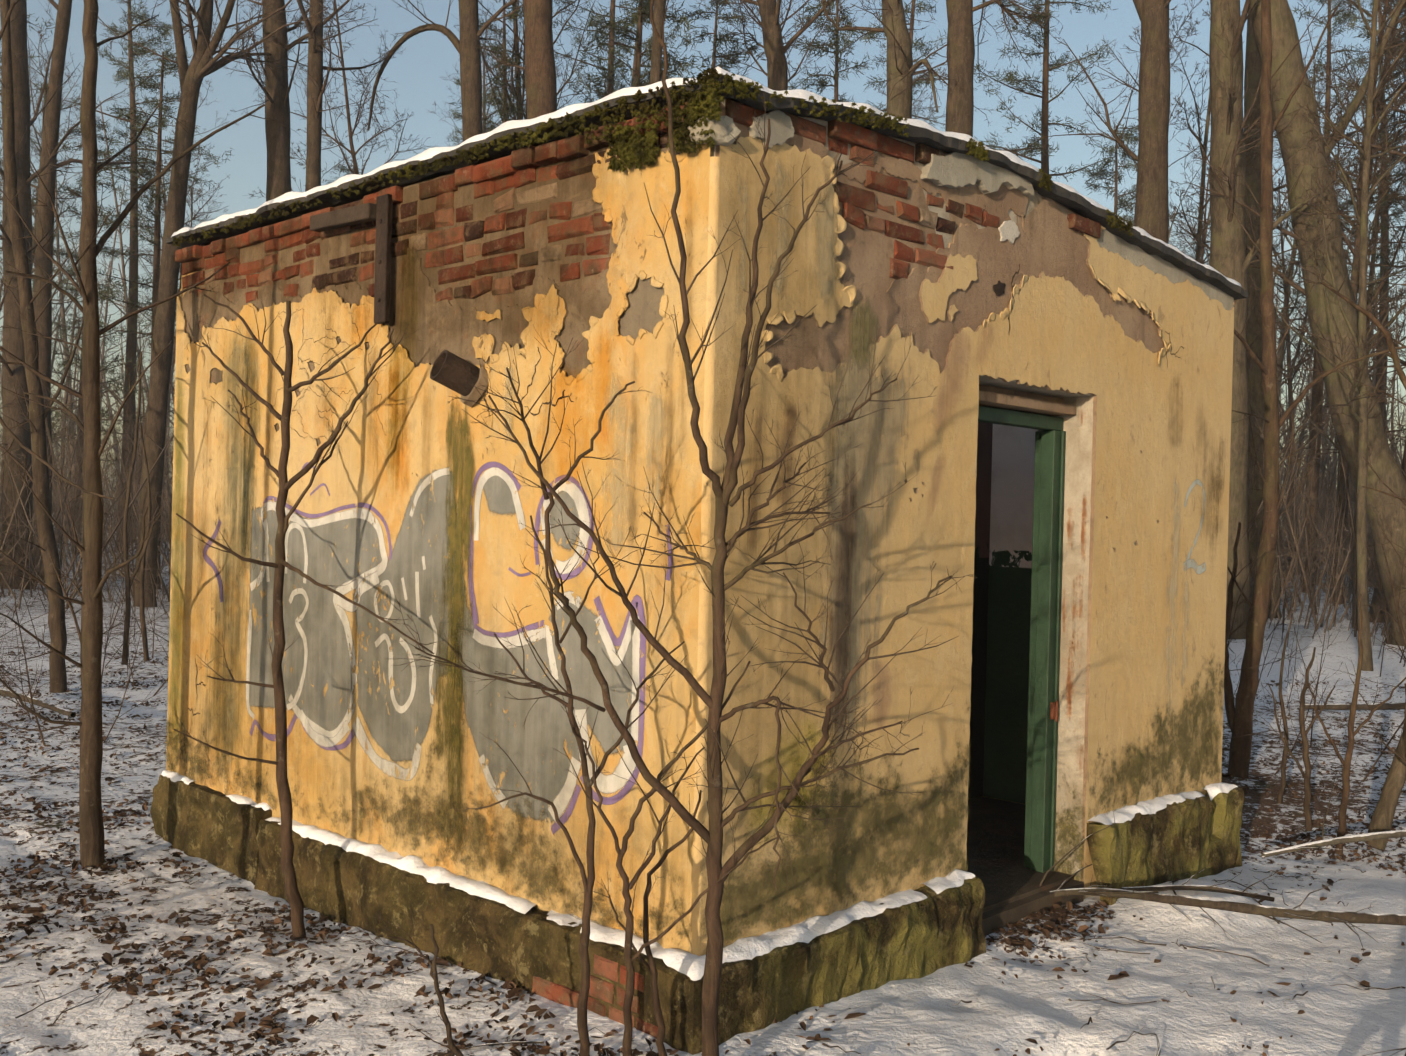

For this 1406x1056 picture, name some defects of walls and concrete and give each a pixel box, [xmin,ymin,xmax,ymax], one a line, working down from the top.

spalling [716,98,750,145]
spalling [180,131,707,386]
spalling [762,134,1234,382]
damp [436,398,475,841]
spalling [532,954,658,1038]